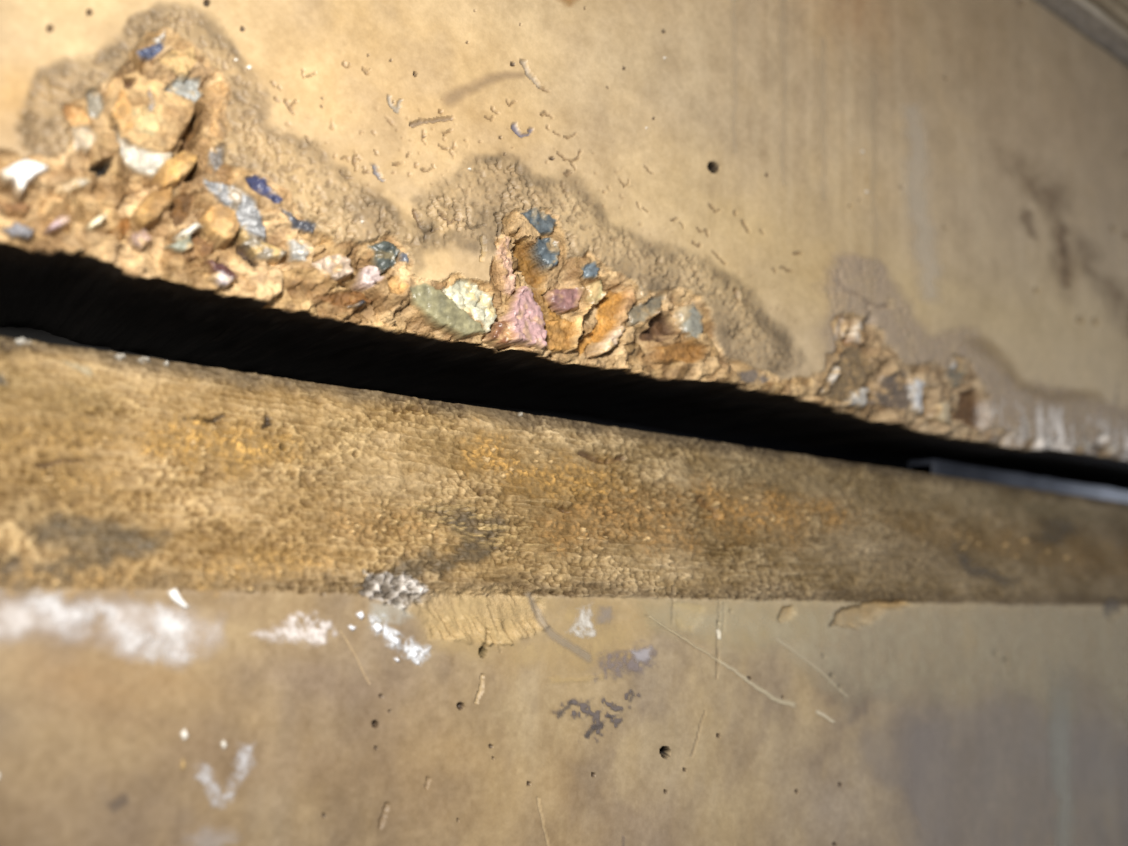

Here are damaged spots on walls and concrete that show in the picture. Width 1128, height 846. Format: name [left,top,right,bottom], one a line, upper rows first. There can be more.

spalling [0,24,1128,461]
damp [0,597,81,634]
damp [109,607,195,649]
damp [260,617,331,643]
damp [349,612,429,664]